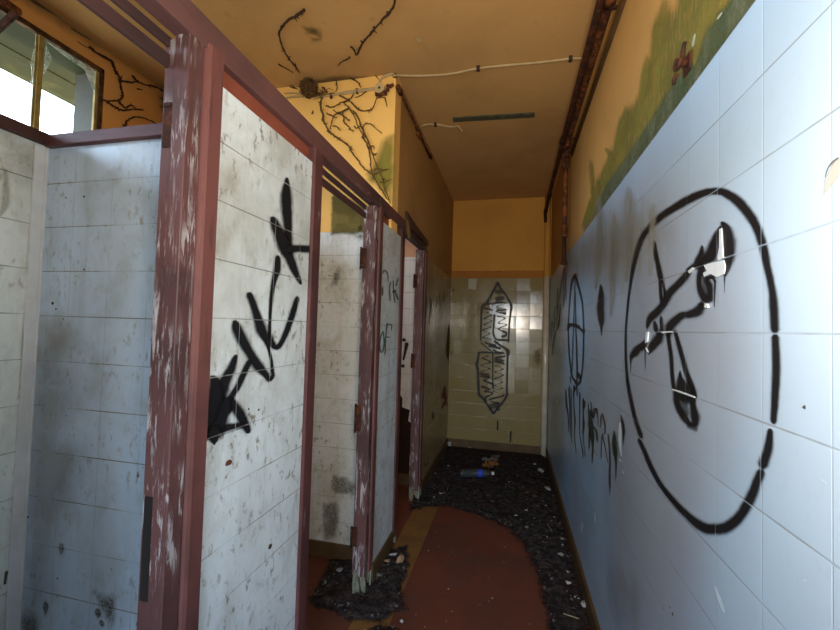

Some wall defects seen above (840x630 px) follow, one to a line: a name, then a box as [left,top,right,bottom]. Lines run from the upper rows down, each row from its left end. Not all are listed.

leakage [95,597,113,626]